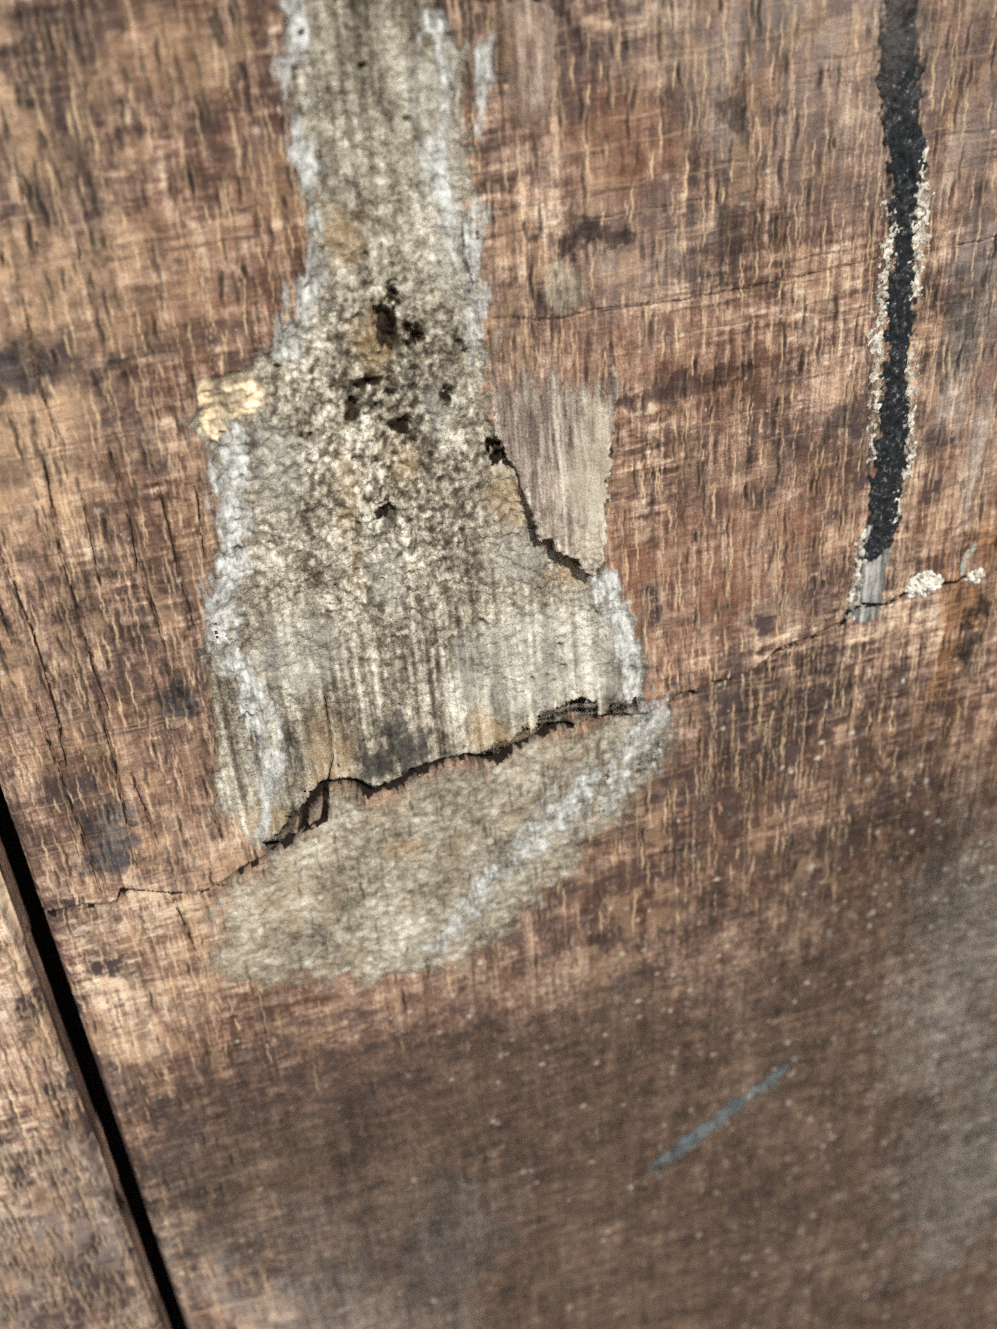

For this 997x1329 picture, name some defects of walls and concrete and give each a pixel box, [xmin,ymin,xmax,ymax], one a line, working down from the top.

spalling [187,0,652,853]
crack [0,296,907,965]
leakage [824,0,936,623]
crack [942,575,967,586]